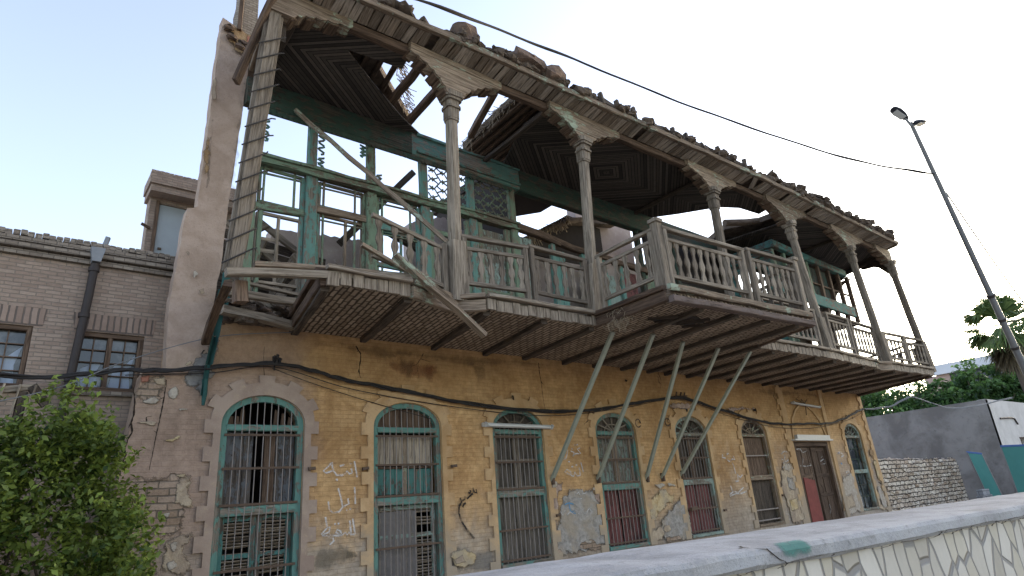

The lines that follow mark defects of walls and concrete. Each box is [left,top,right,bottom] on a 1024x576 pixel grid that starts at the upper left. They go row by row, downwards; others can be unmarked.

flaking render [228,26,251,54]
flaking render [135,375,187,411]
crack [120,380,167,474]
flaking render [122,473,193,576]
peeling [650,483,683,542]